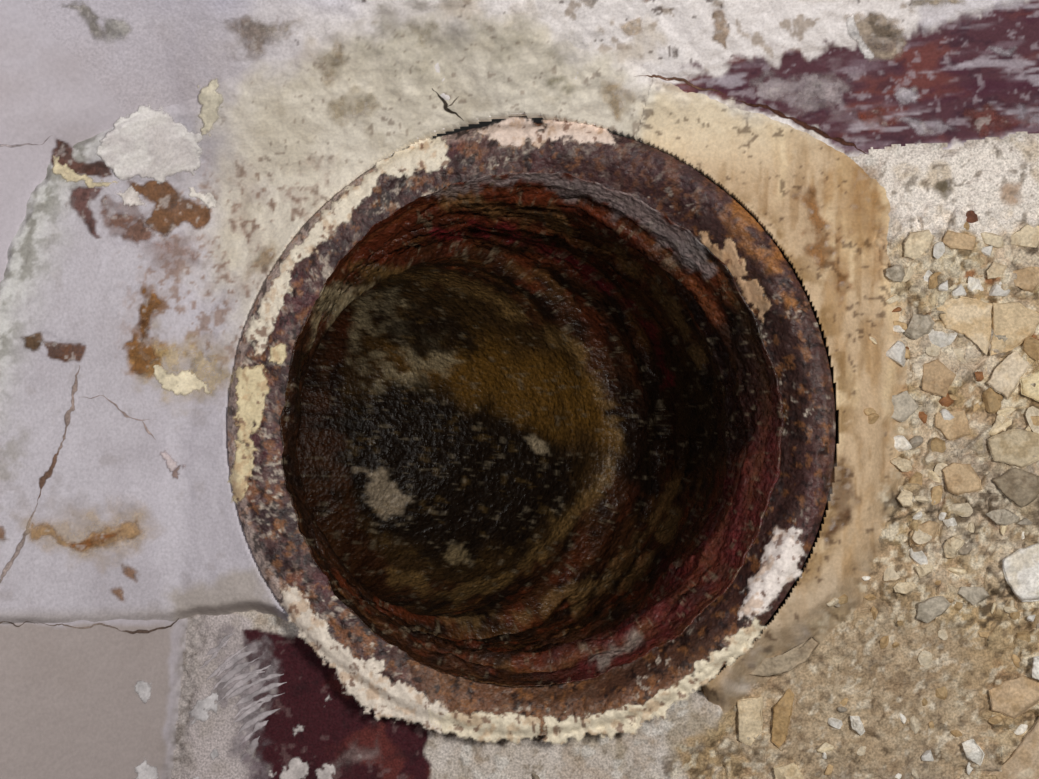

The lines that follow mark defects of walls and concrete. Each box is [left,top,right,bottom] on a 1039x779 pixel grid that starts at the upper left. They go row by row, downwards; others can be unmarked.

flaking render [713,11,729,47]
flaking render [847,14,906,59]
flaking render [51,140,217,250]
flaking render [935,181,951,196]
corrosion [804,189,834,264]
flaking render [25,333,85,362]
corrosion [126,287,167,377]
peeling [153,365,210,395]
crack [0,365,155,583]
corrosion [31,521,140,551]
corrosion [826,508,851,539]
crack [0,621,177,634]